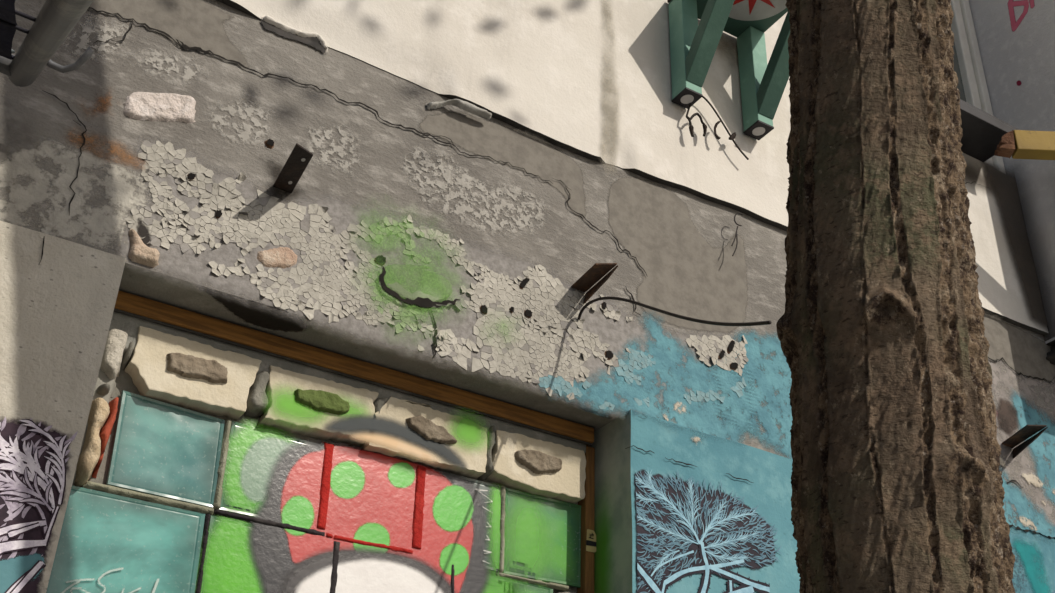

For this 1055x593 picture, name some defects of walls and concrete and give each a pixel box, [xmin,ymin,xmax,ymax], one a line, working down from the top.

peeling [137,49,201,81]
spalling [123,92,196,123]
peeling [209,99,270,147]
spalling [426,99,492,119]
crack [42,90,87,216]
peeling [307,126,359,176]
crack [89,7,648,316]
peeling [124,140,656,418]
peeling [664,335,749,421]
peeling [1022,472,1055,505]